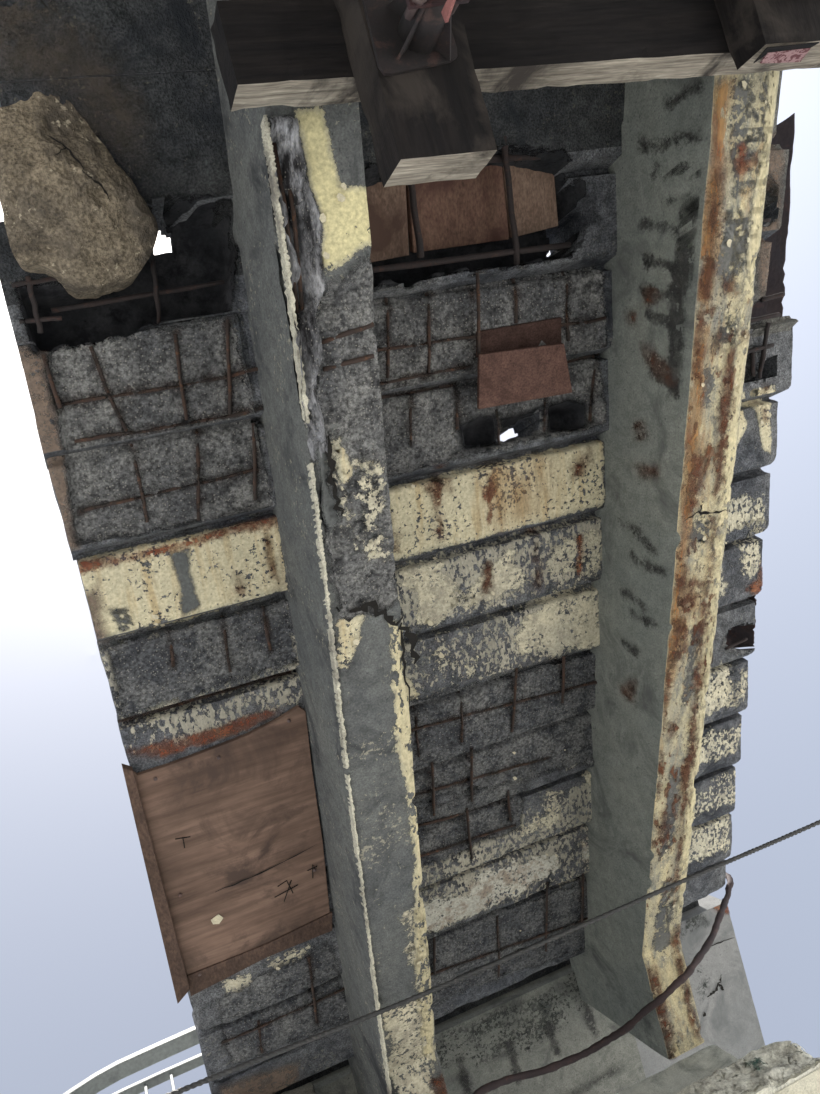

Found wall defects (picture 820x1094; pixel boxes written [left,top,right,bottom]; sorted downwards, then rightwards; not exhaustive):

water stain [640,194,699,399]
spalling [11,194,303,759]
spalling [261,106,611,1094]
rust [425,466,451,537]
rust [483,477,497,523]
rust [571,455,590,477]
water stain [630,525,666,575]
rust [643,82,758,907]
peeling [652,71,785,953]
rust [647,969,676,1060]
rust [671,926,701,1035]